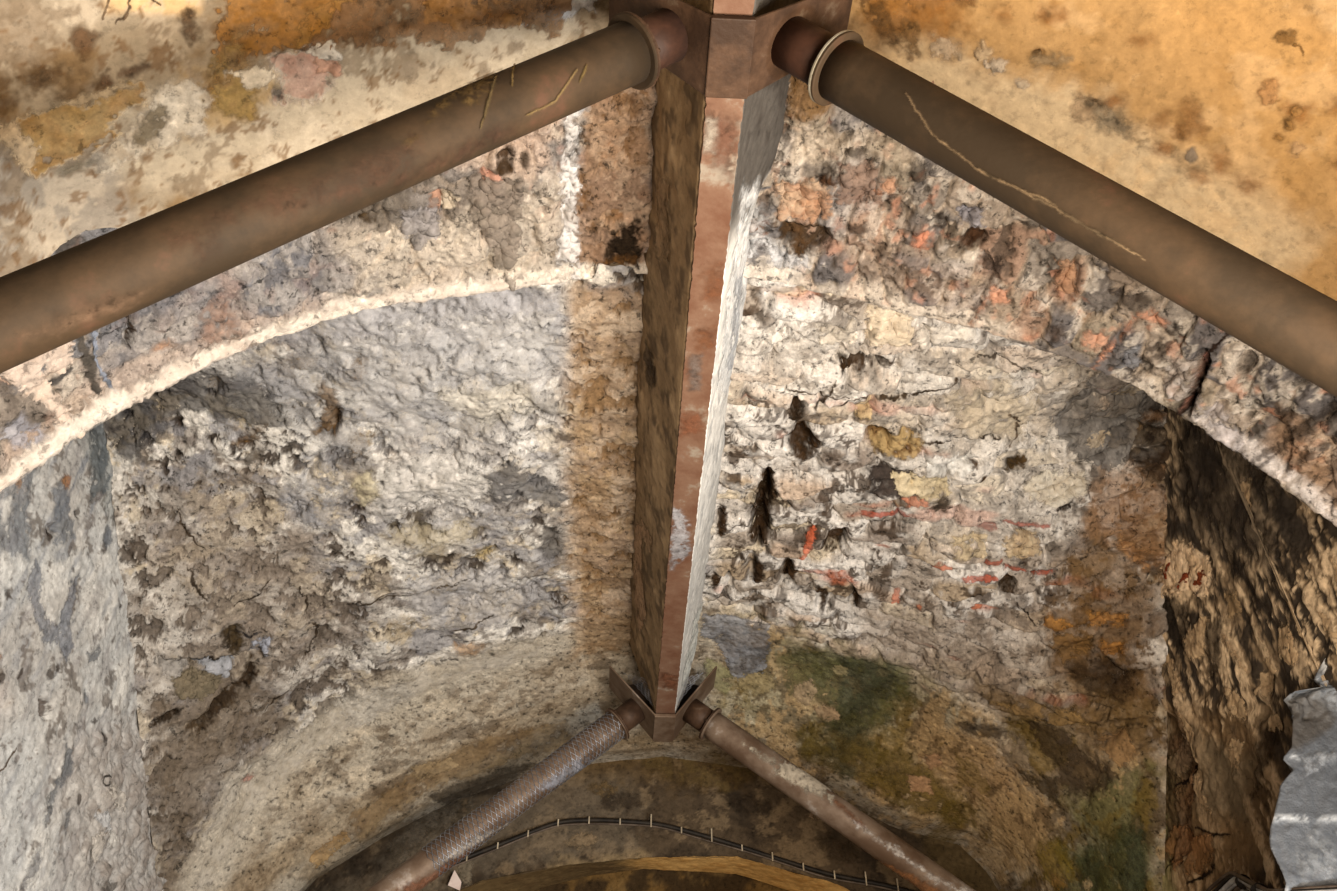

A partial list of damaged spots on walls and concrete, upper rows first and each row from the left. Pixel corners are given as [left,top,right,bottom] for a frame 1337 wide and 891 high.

crack [102,0,161,24]
corrosion [442,63,515,129]
corrosion [526,64,587,116]
flaking render [0,342,85,439]
spalling [789,396,823,462]
spalling [854,259,1202,593]
crack [1177,333,1229,416]
spalling [748,467,778,583]
damp [1116,388,1337,706]
damp [1043,610,1134,701]
damp [776,644,924,783]
damp [1250,722,1278,797]